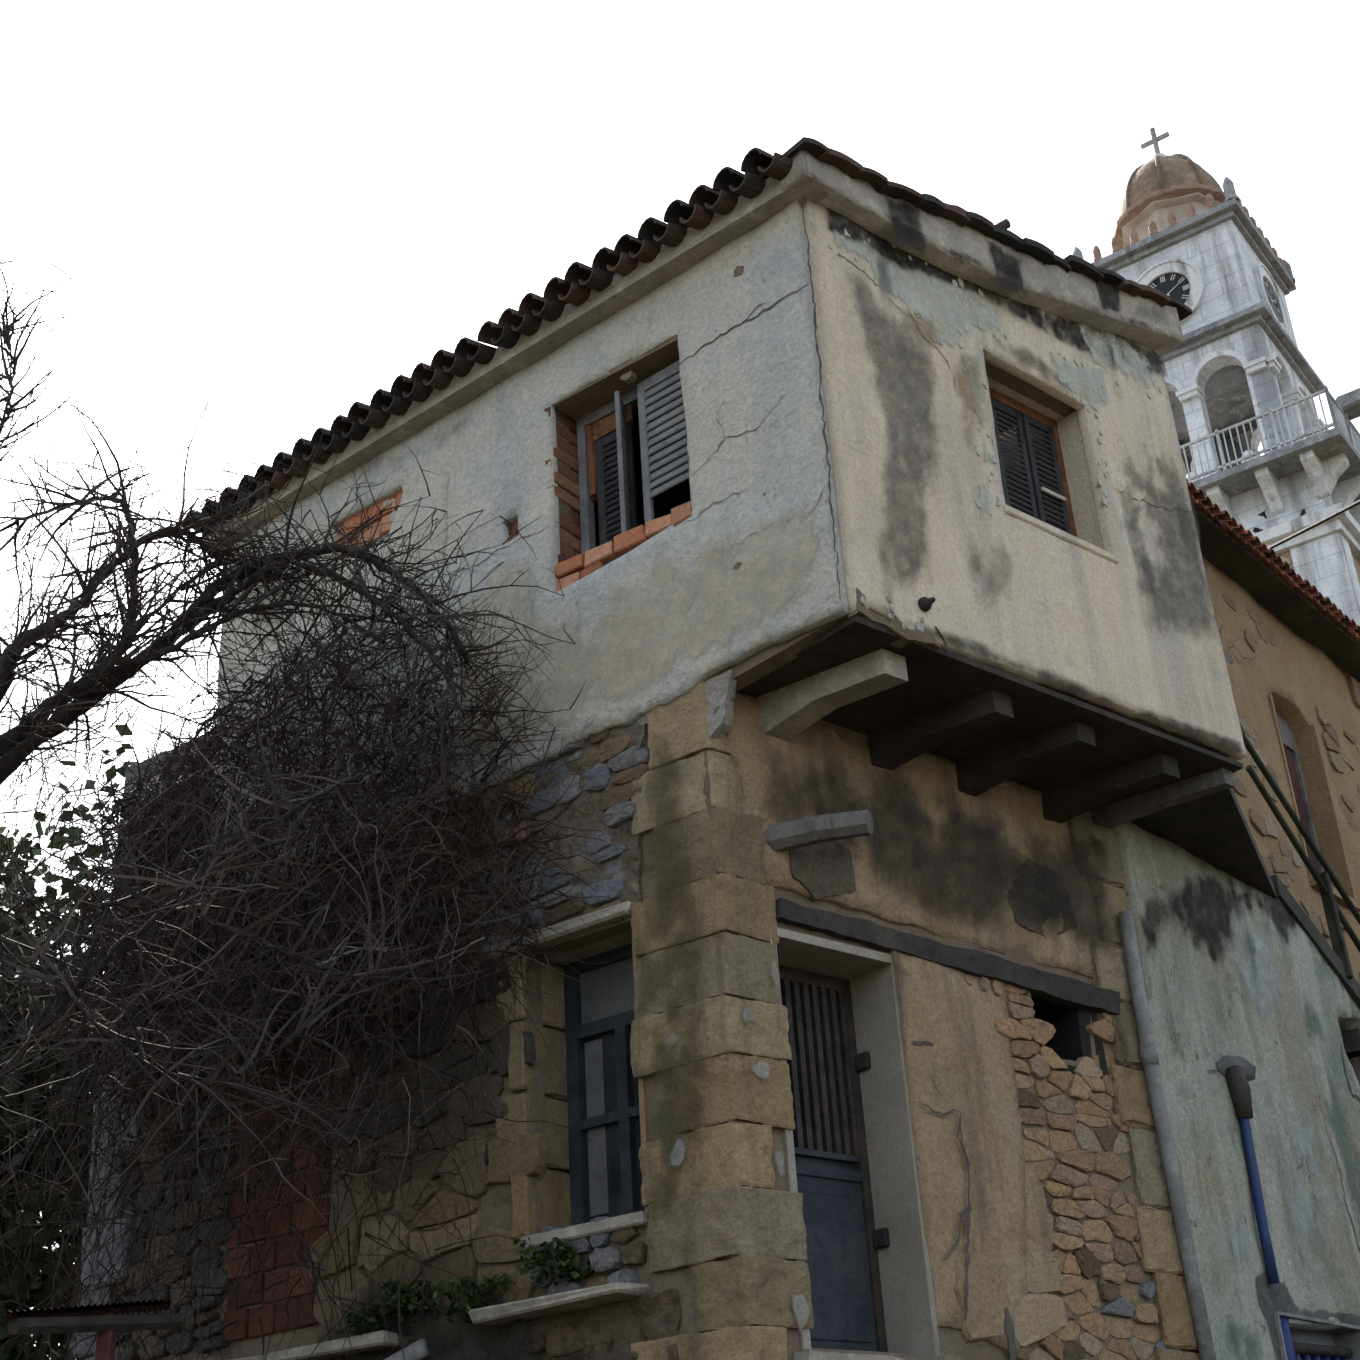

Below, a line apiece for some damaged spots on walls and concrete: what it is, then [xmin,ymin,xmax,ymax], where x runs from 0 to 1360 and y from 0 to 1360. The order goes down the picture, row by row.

crack [677,195,956,600]
leakage [858,285,935,577]
leakage [828,199,1165,373]
leakage [1015,350,1062,383]
spalling [337,490,403,557]
leakage [1127,462,1210,629]
leakage [771,763,1110,946]
leakage [1142,877,1296,1016]
spalling [994,984,1181,1360]